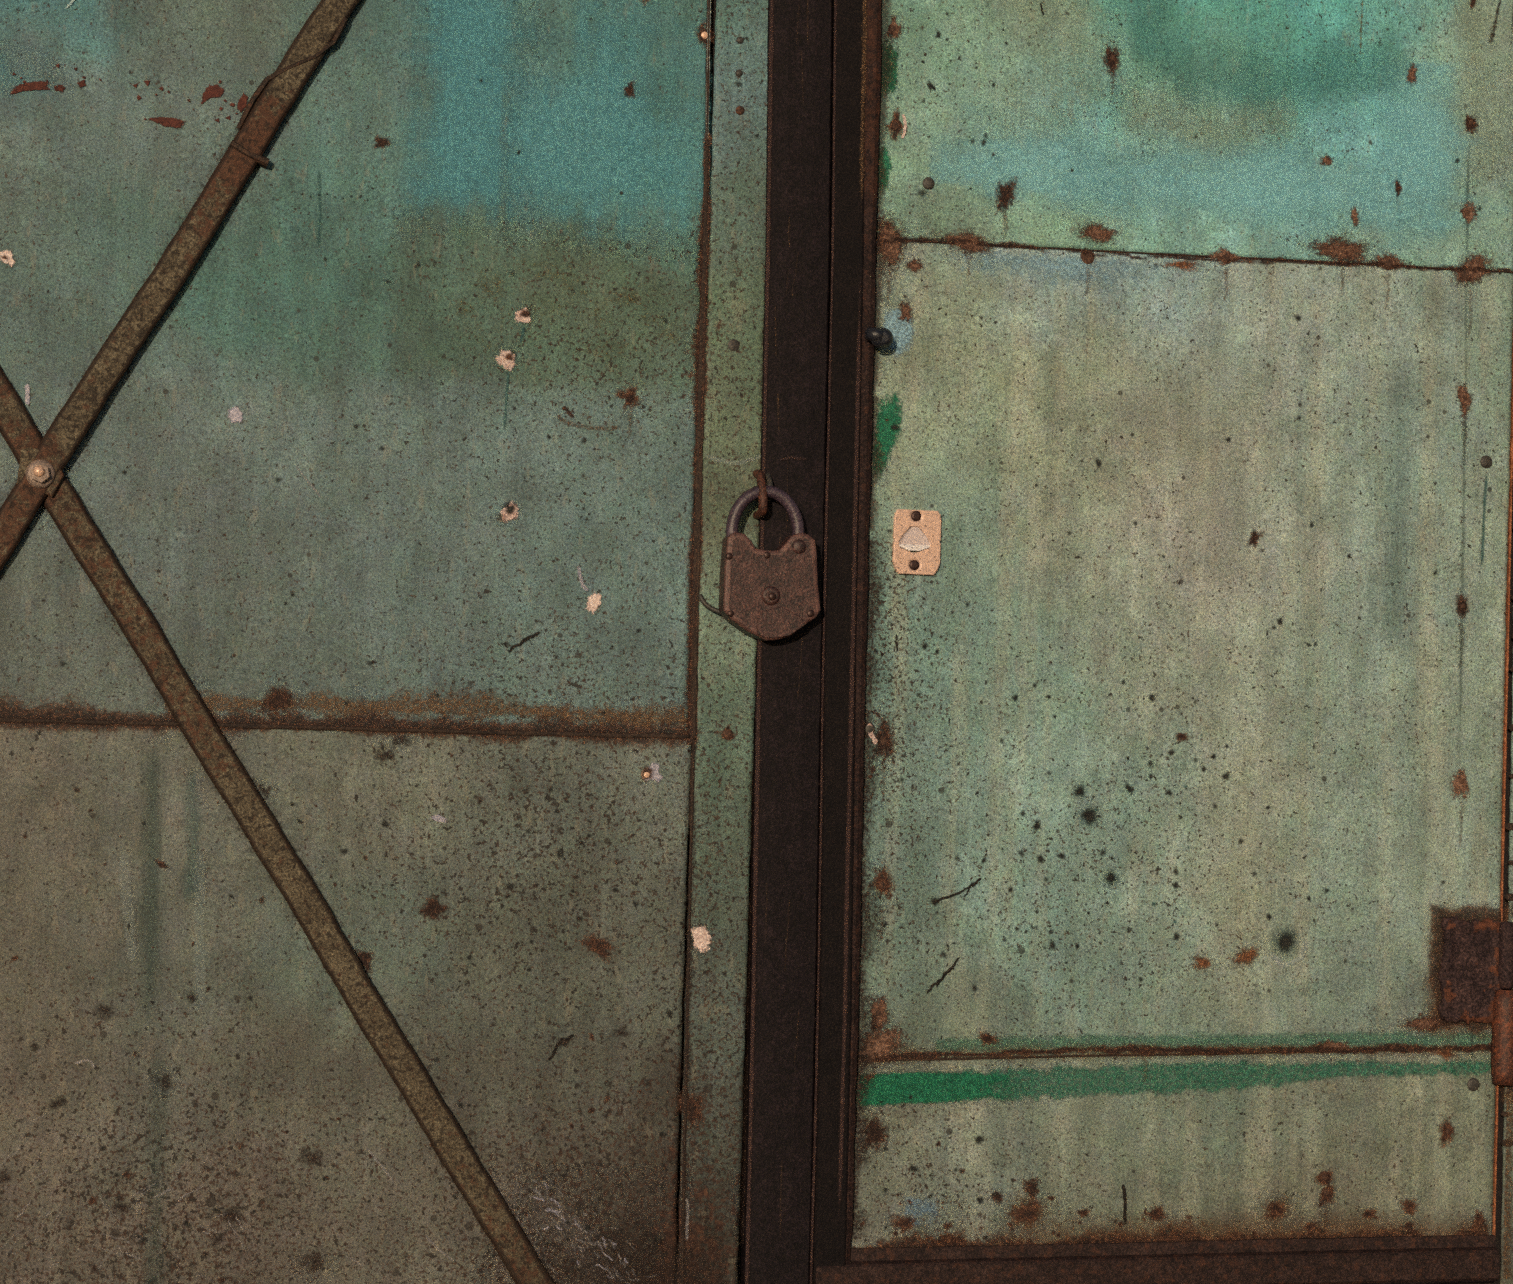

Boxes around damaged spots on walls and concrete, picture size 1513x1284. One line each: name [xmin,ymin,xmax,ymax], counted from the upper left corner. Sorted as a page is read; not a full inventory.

peeling [515,308,531,323]
peeling [496,350,515,371]
corrosion [199,133,711,751]
peeling [500,501,519,522]
corrosion [810,0,837,1284]
corrosion [839,0,1513,1279]
corrosion [0,694,180,732]
peeling [691,926,712,953]